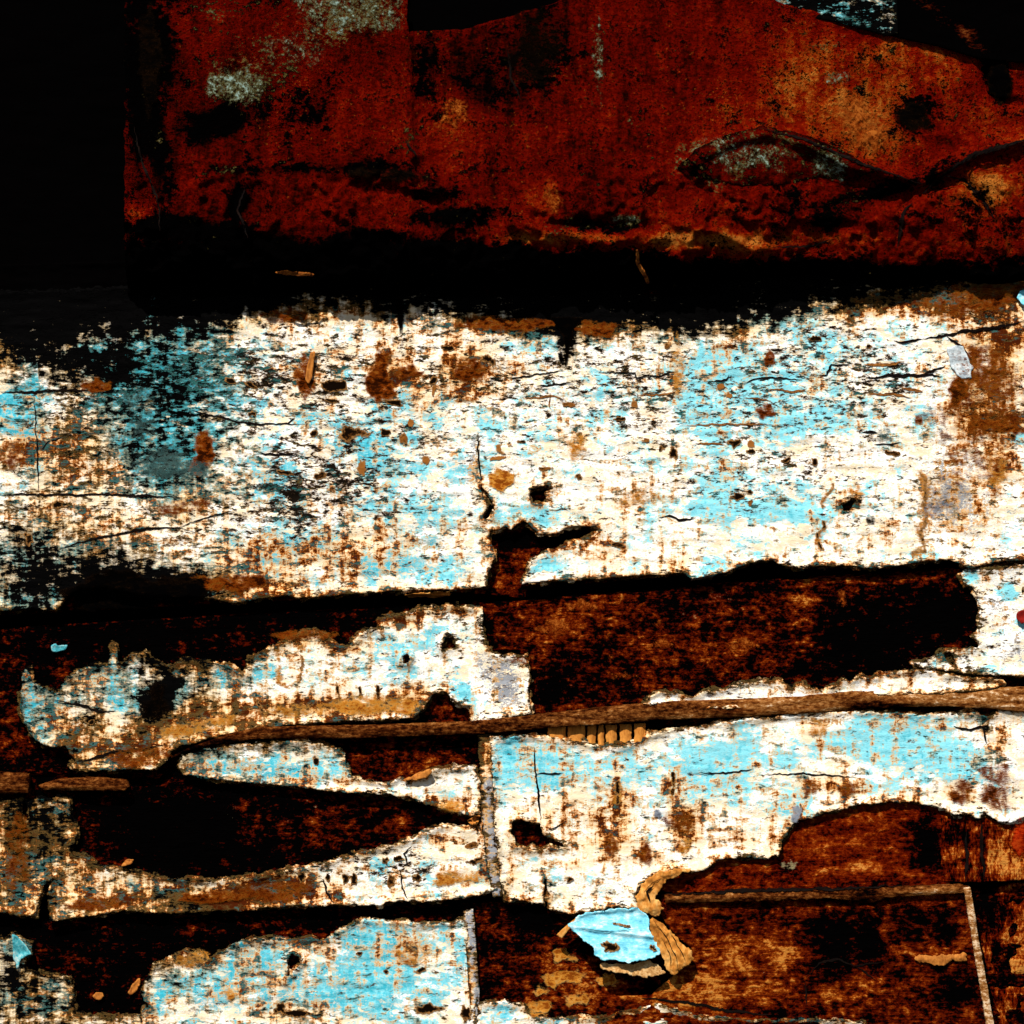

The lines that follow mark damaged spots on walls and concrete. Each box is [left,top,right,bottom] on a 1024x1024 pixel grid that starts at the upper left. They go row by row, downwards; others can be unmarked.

rust [123,0,1024,323]
rust [365,348,424,404]
rust [451,358,485,383]
crack [475,434,483,484]
crack [681,320,1024,445]
rust [914,342,1024,497]
peeling [0,591,452,774]
peeling [460,521,978,714]
peeling [71,694,481,888]
peeling [0,801,951,1023]
rust [639,841,652,865]
rust [662,813,699,853]